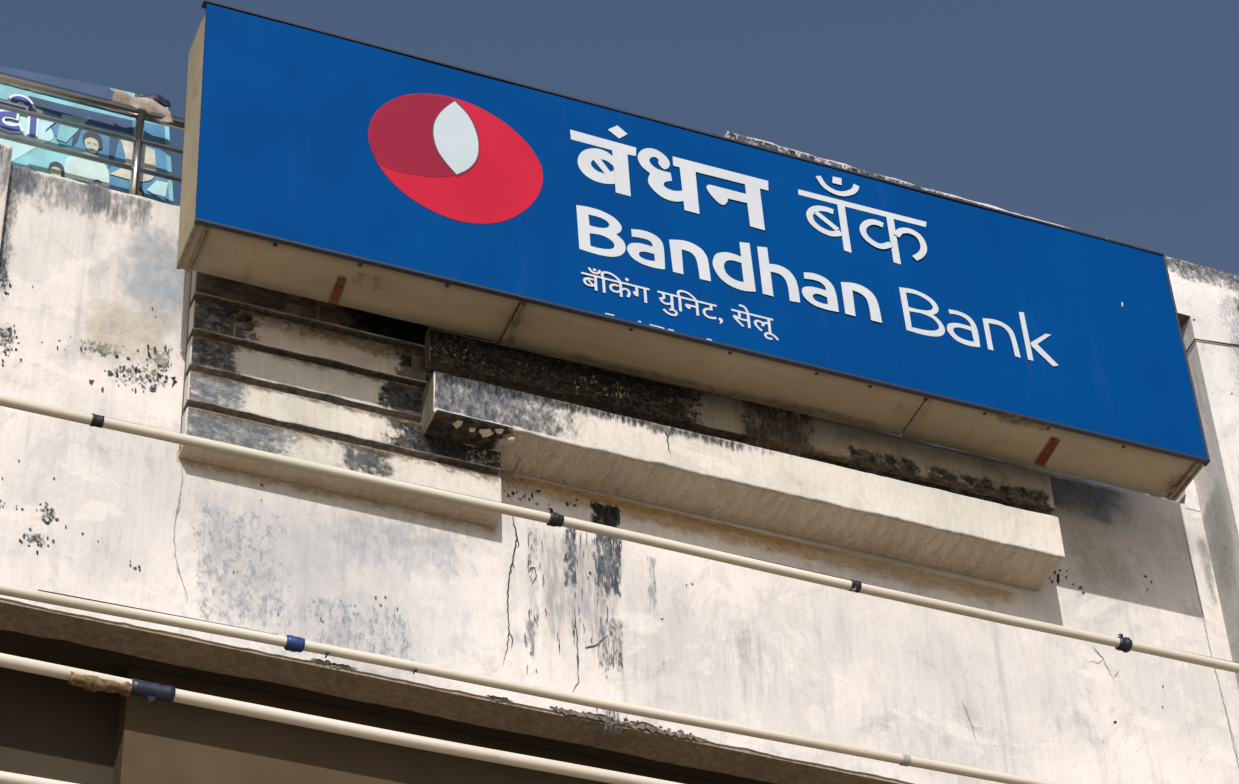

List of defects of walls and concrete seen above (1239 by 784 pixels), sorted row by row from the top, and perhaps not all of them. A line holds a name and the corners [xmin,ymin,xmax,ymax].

leakage [0,145,152,284]
leakage [130,237,296,456]
flaking render [452,420,515,443]
leakage [334,306,1120,520]
crack [173,473,187,596]
crack [503,516,537,663]
leakage [524,608,547,673]
leakage [557,502,623,677]
rust [501,470,1012,600]